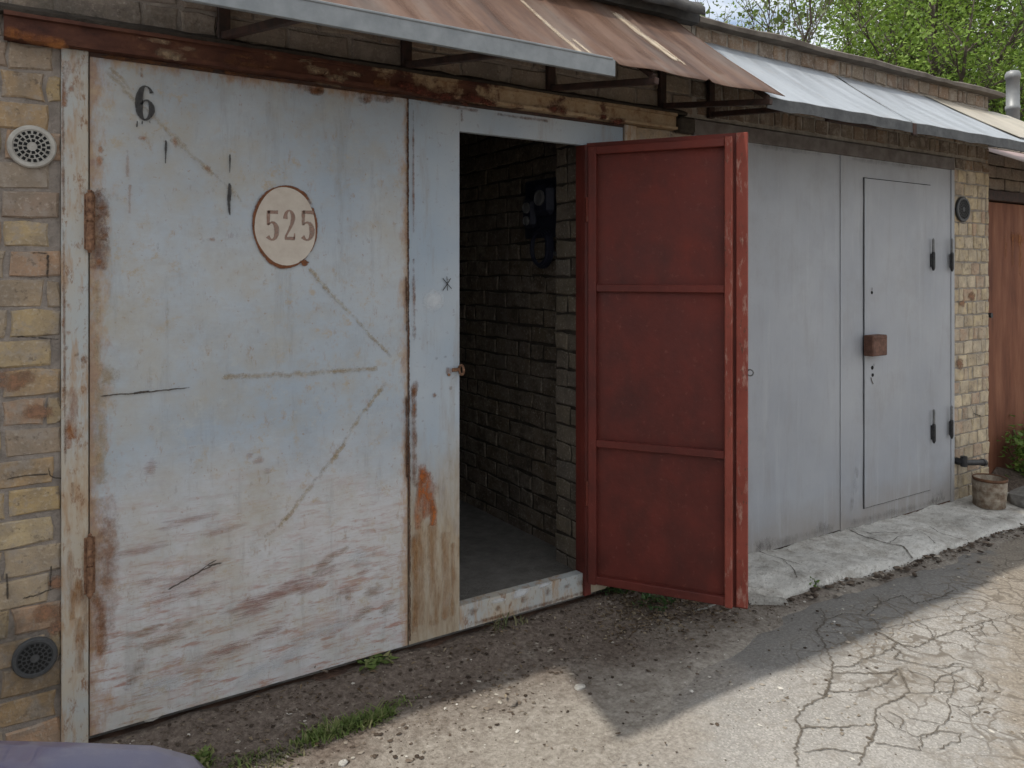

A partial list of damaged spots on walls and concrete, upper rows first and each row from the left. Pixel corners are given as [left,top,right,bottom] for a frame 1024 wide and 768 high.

corrosion [405,98,437,641]
crack [799,590,1023,754]